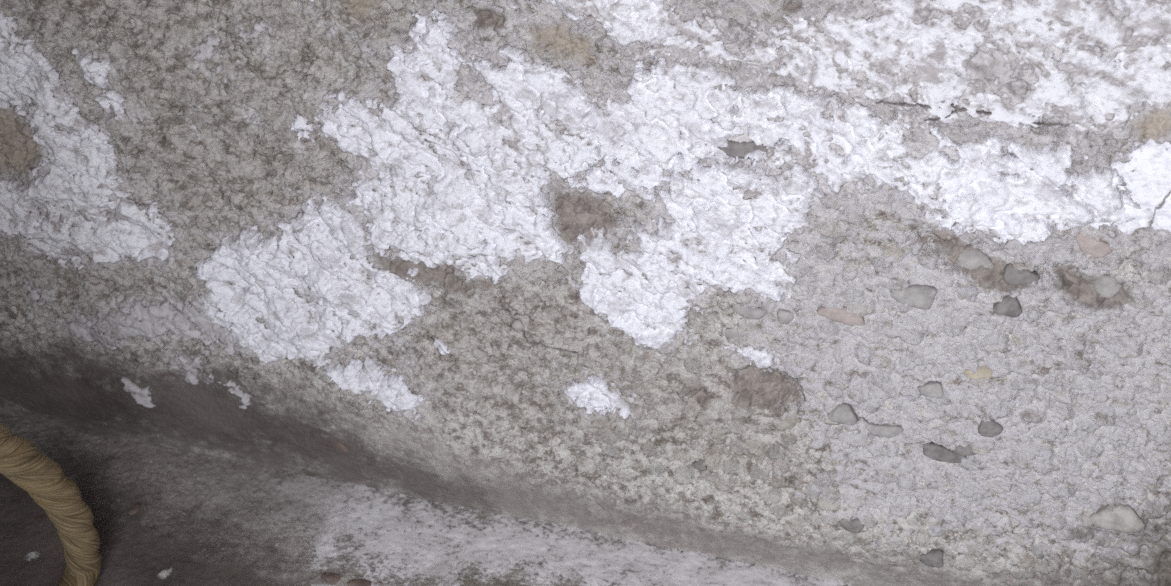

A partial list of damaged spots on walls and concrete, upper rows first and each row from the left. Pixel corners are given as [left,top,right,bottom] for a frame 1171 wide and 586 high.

leakage [172,0,289,98]
leakage [298,0,378,73]
leakage [0,11,196,275]
leakage [232,98,271,133]
crack [1150,191,1171,228]
leakage [717,318,782,377]
leakage [537,356,649,427]
leakage [1138,525,1171,586]